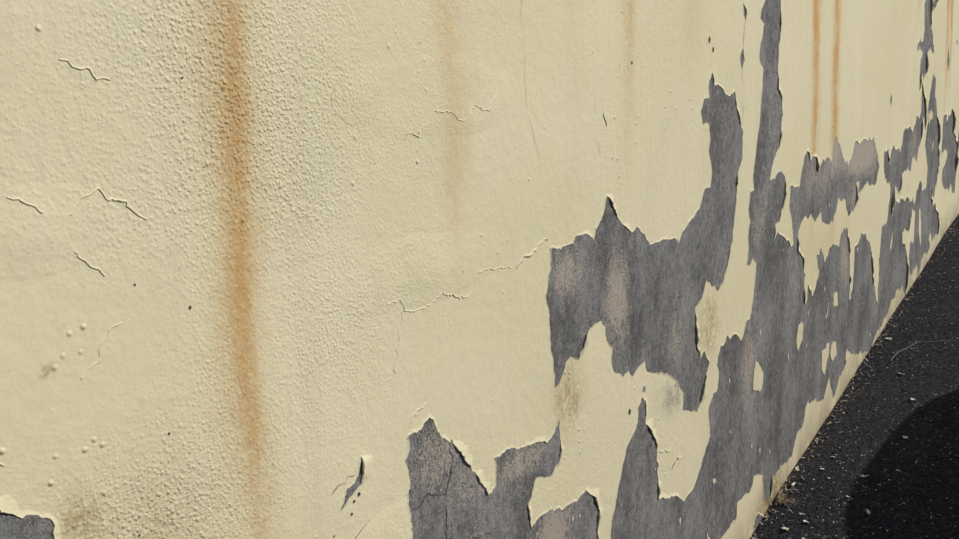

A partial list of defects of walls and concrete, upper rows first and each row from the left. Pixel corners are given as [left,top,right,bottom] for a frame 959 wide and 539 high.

crack [59,58,111,81]
crack [7,187,148,229]
crack [75,251,106,277]
peeling [404,0,959,539]
crack [387,238,548,383]
peeling [340,454,375,516]
peeling [0,495,65,539]